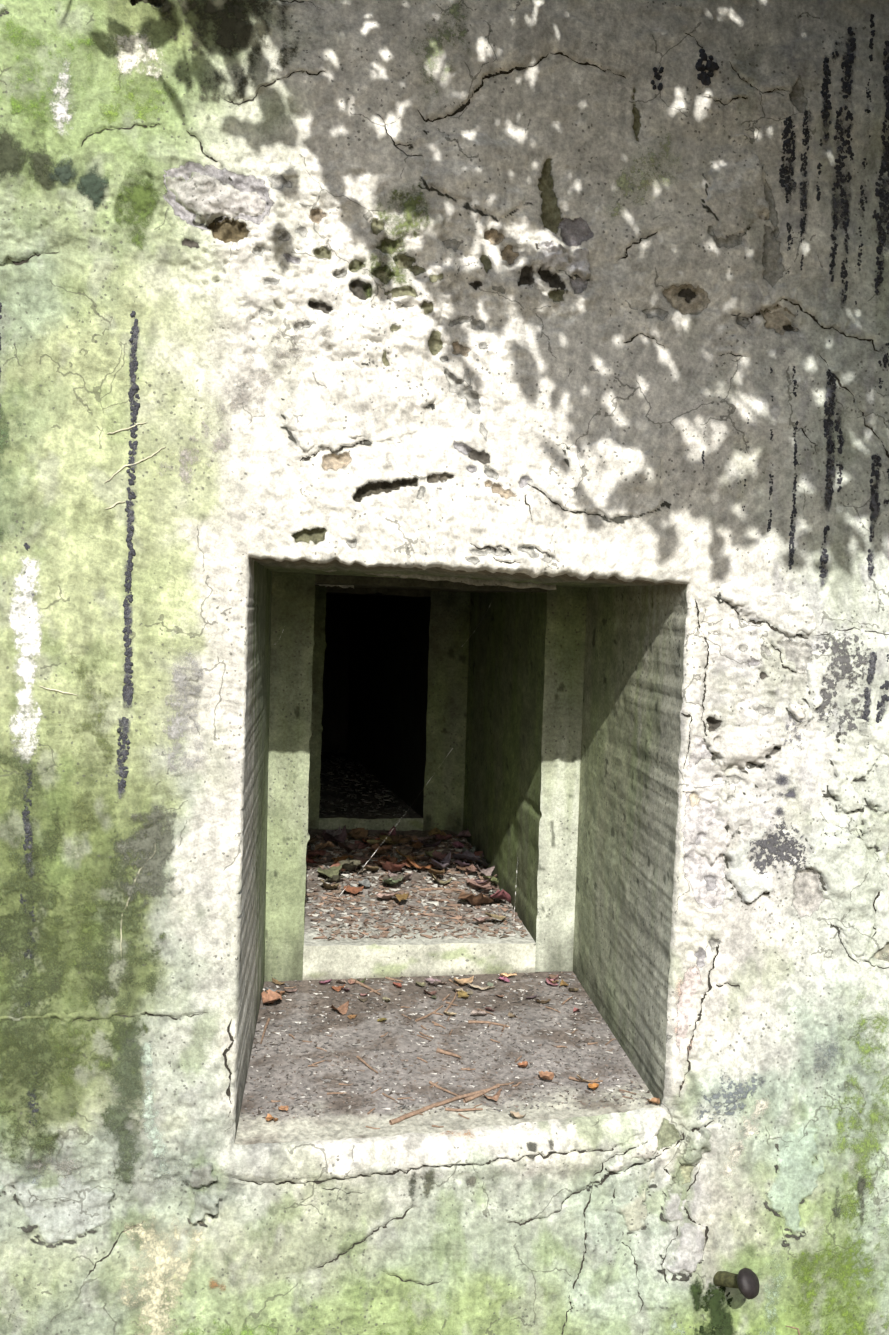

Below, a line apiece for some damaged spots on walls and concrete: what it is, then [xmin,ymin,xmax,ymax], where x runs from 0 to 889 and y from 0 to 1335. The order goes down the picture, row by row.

damp [71,311,140,799]
peeling [163,161,292,256]
spalling [278,209,443,314]
peeling [281,316,532,502]
crack [716,253,889,458]
crack [734,595,889,674]
damp [819,369,845,586]
damp [779,14,889,308]
spalling [681,578,829,909]
damp [0,543,79,1184]
crack [0,992,239,1137]
crack [232,938,751,1335]